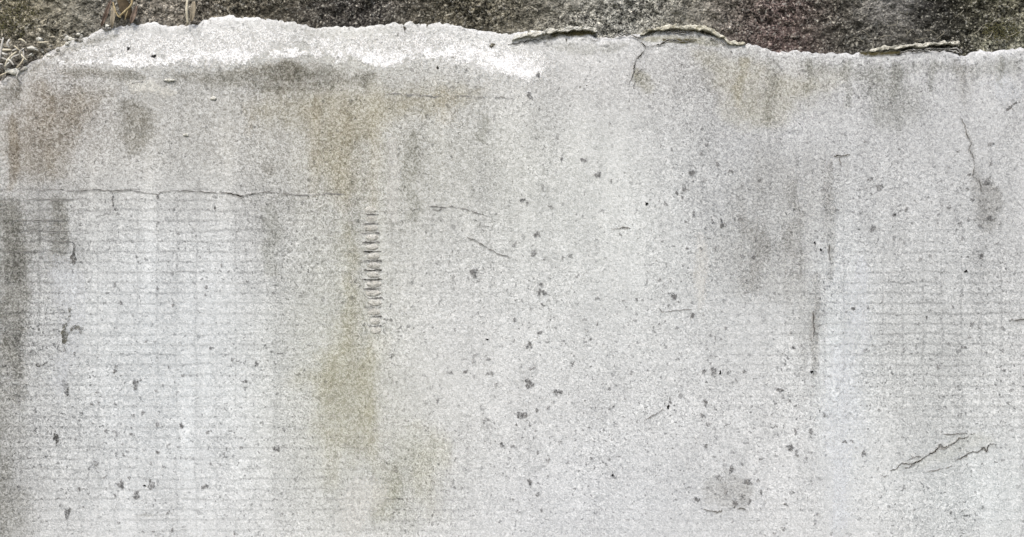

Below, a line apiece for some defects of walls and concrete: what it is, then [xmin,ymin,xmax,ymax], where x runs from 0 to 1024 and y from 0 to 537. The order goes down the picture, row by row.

peeling [0,0,1024,81]
crack [629,37,693,88]
crack [962,119,982,192]
crack [9,189,341,253]
crack [881,433,996,477]